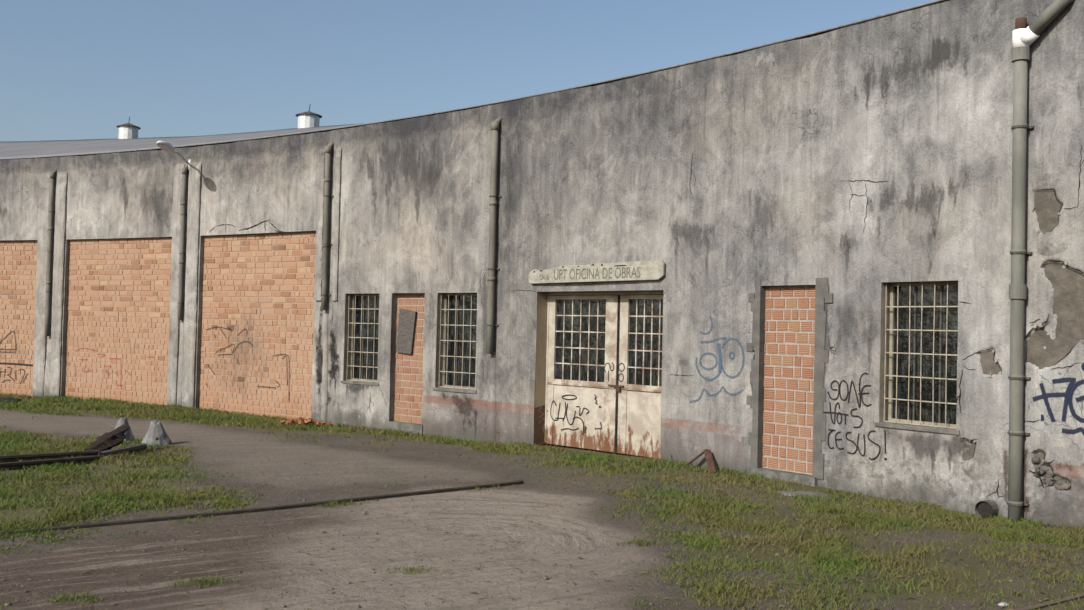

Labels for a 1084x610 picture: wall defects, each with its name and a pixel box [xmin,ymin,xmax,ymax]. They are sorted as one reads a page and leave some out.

water stain [854,39,960,98]
water stain [868,174,969,236]
spalling [1031,188,1063,234]
spalling [1024,260,1084,369]
spalling [978,348,1002,378]
spalling [1031,449,1082,493]